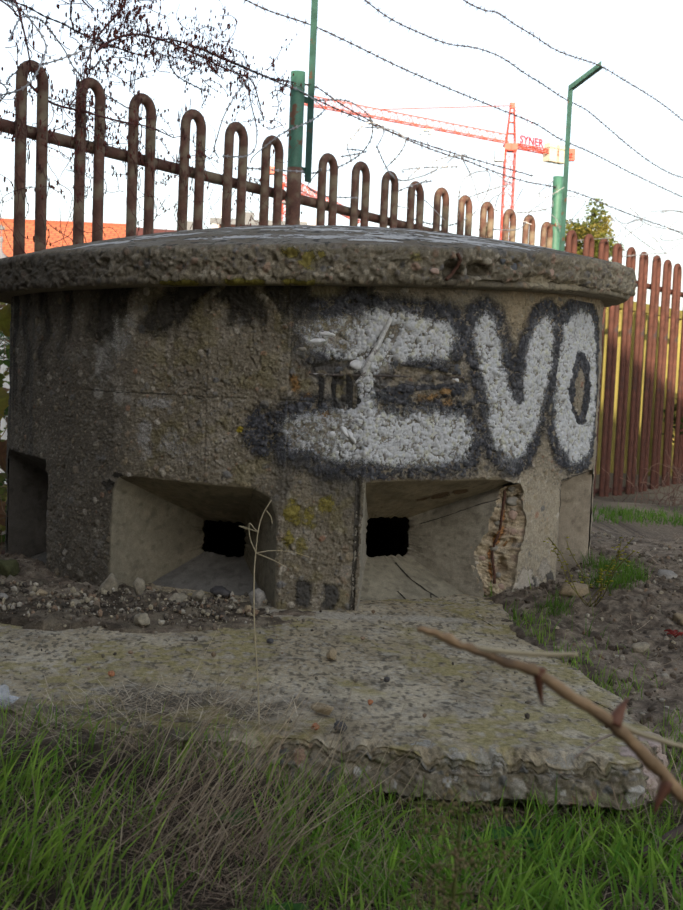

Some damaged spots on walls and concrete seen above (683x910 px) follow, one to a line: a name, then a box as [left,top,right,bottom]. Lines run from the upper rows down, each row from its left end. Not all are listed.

spalling [470,484,527,596]